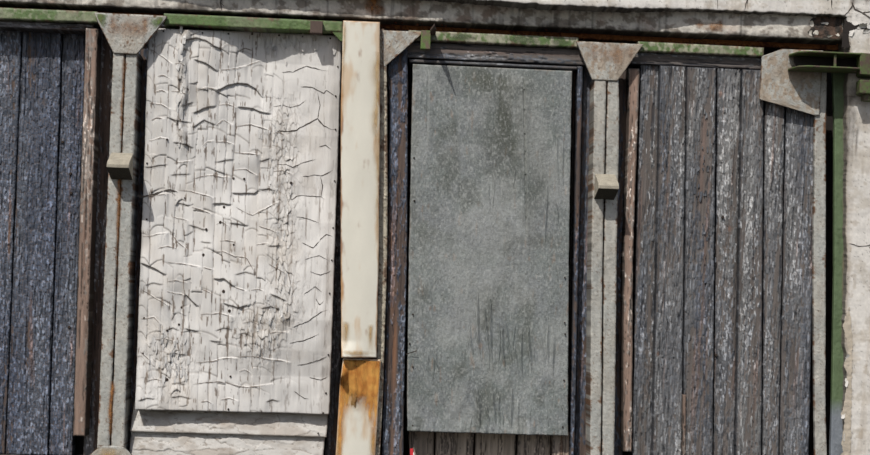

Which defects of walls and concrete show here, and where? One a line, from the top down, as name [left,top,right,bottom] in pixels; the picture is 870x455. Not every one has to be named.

crack [827,0,870,18]
crack [136,38,335,404]
corrosion [337,352,380,455]
peeling [841,307,853,455]